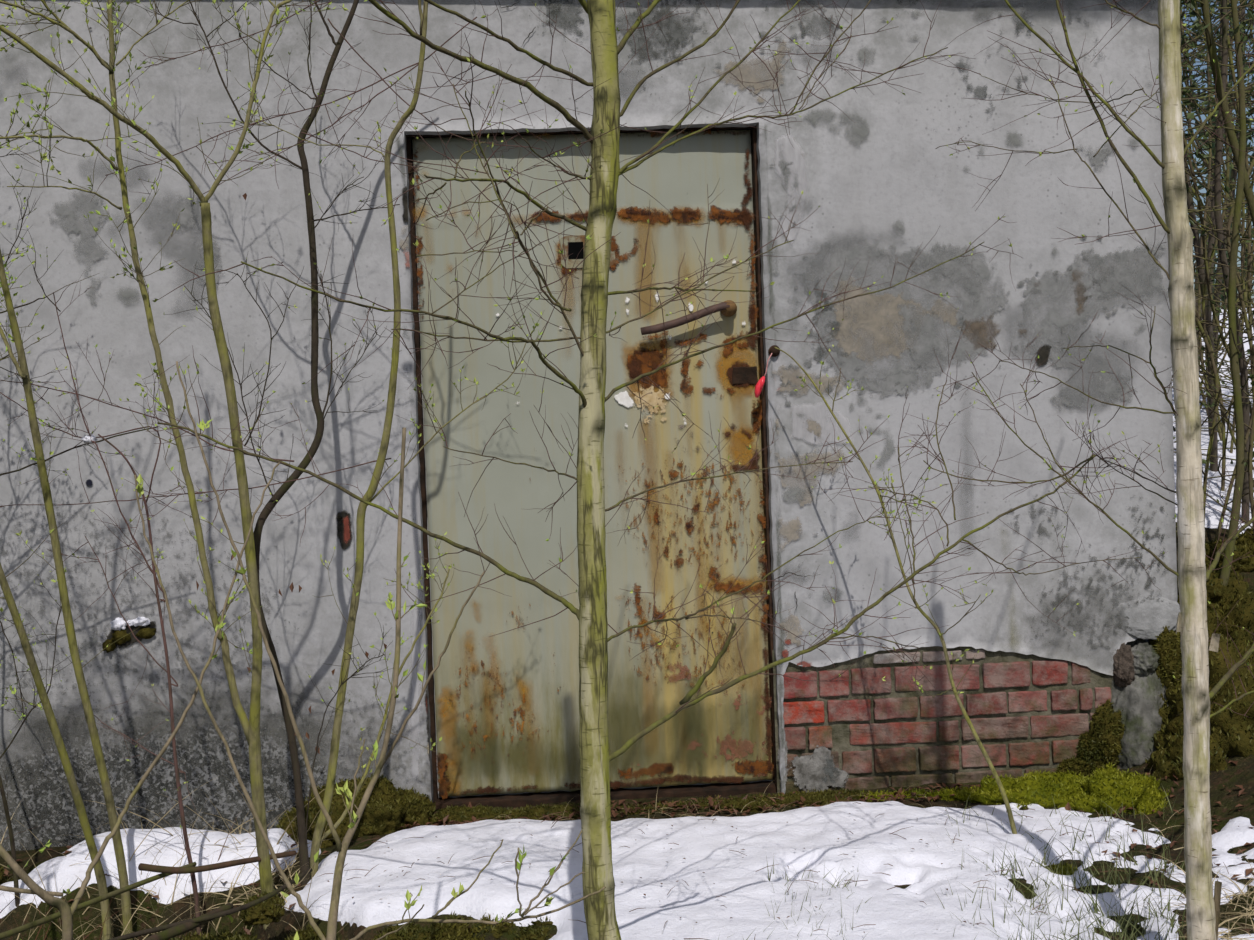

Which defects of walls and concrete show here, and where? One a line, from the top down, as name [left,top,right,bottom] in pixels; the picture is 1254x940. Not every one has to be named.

corrosion [518,211,588,223]
peeling [772,135,807,243]
corrosion [610,149,774,789]
peeling [773,235,1168,549]
water stain [0,683,353,851]
corrosion [435,646,549,799]
spalling [772,611,1182,793]